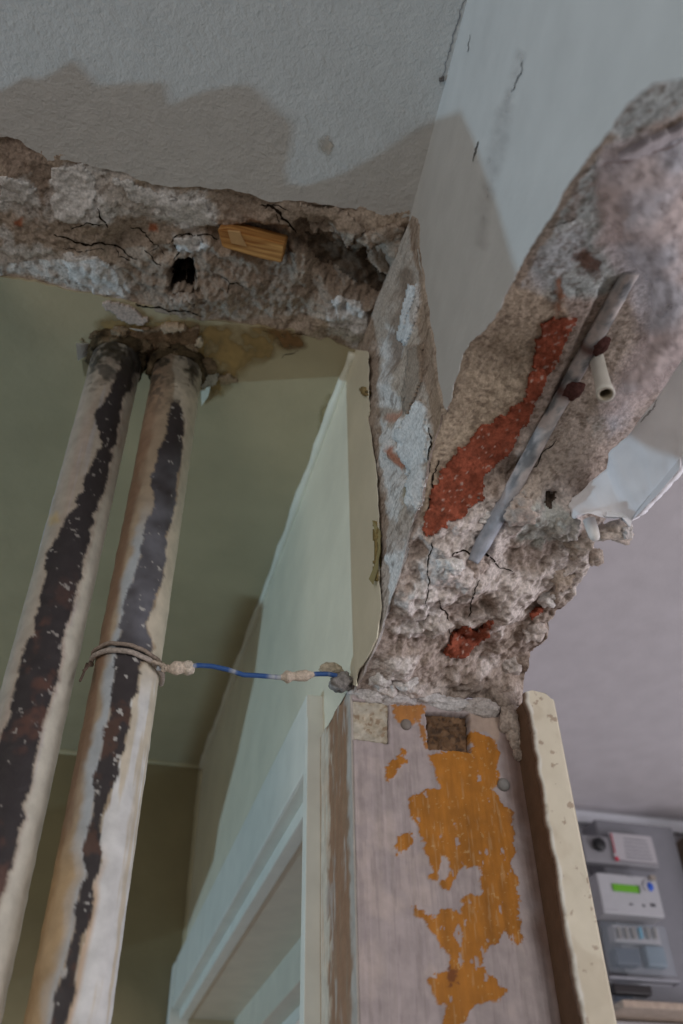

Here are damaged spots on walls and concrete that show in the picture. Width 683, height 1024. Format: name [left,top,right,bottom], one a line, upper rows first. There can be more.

crack [54,208,217,266]
crack [261,204,296,232]
water stain [100,319,304,395]
spalling [0,79,683,762]
crack [423,427,513,633]